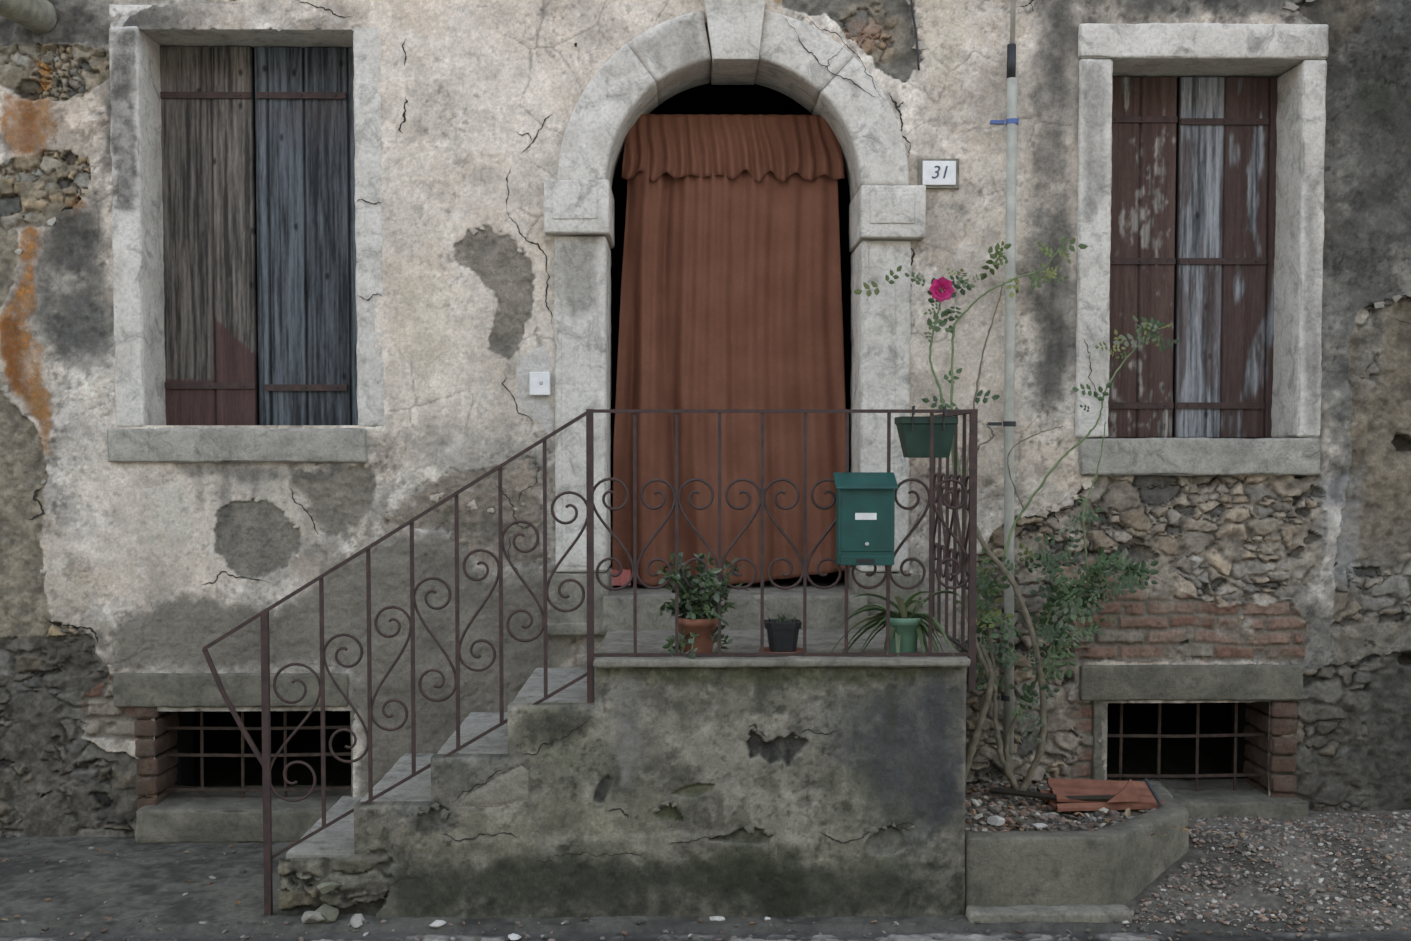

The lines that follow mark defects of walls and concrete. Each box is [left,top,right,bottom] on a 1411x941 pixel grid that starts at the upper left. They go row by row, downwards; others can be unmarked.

spalling [782,0,929,83]
spalling [1283,0,1377,55]
crack [784,18,911,157]
spalling [454,226,535,360]
flaking render [213,457,552,579]
flaking render [1020,477,1094,519]
spalling [1329,295,1411,666]
flaking render [80,674,155,741]
spalling [739,728,807,765]
spalling [652,783,714,820]
crack [820,822,921,844]